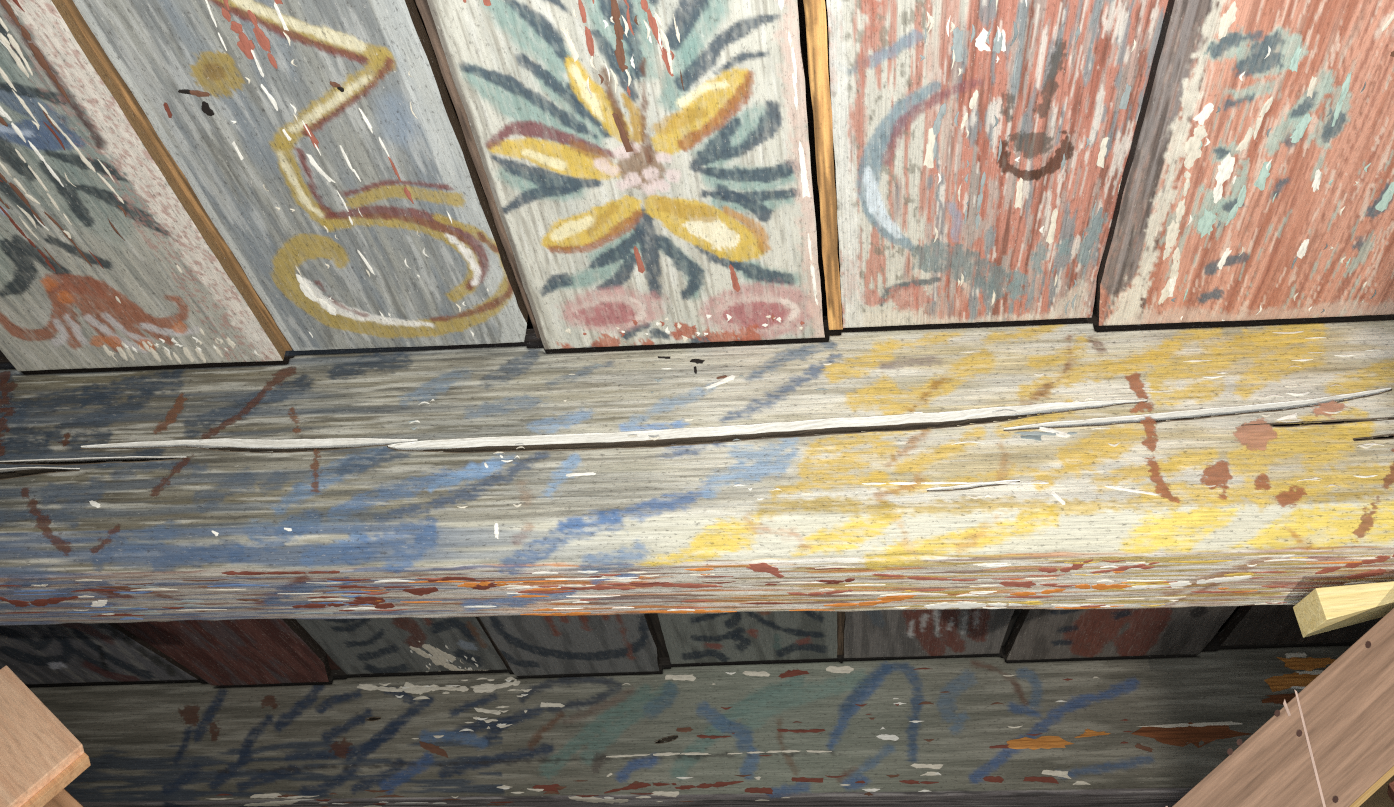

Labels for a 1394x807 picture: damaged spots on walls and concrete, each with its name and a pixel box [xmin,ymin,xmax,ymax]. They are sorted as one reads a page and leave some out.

peeling [920,0,1018,84]
peeling [1218,1,1237,39]
peeling [1289,45,1366,143]
peeling [798,140,811,198]
peeling [923,89,978,185]
peeling [958,116,1023,230]
peeling [1084,137,1108,168]
peeling [1158,96,1277,320]
peeling [1375,182,1394,212]
peeling [1291,239,1351,269]
crack [0,387,1394,480]
crack [927,479,1020,492]